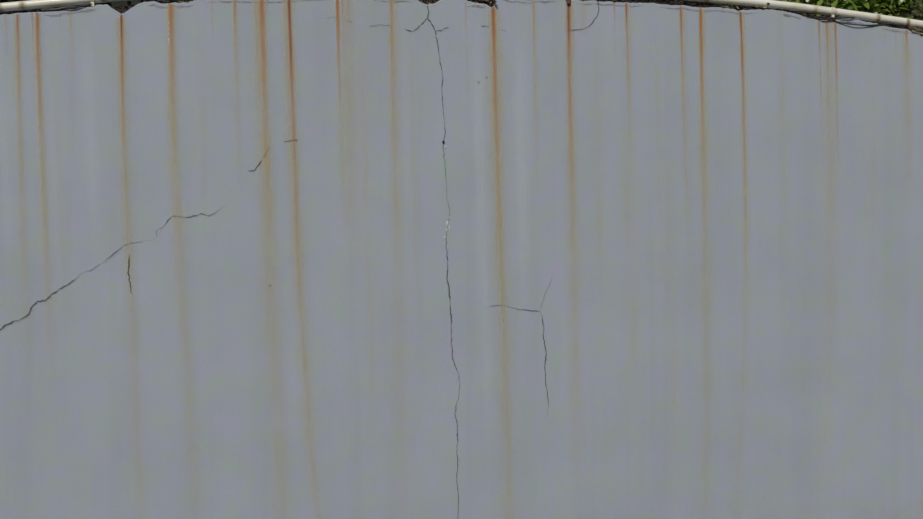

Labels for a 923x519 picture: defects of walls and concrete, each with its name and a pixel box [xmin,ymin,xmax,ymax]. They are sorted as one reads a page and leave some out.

corrosion [255,0,267,109]
corrosion [285,0,299,255]
crack [369,6,448,174]
corrosion [490,6,502,246]
corrosion [699,0,707,160]
crack [0,209,220,330]
crack [444,200,452,322]
crack [495,305,549,404]
crack [453,433,461,513]